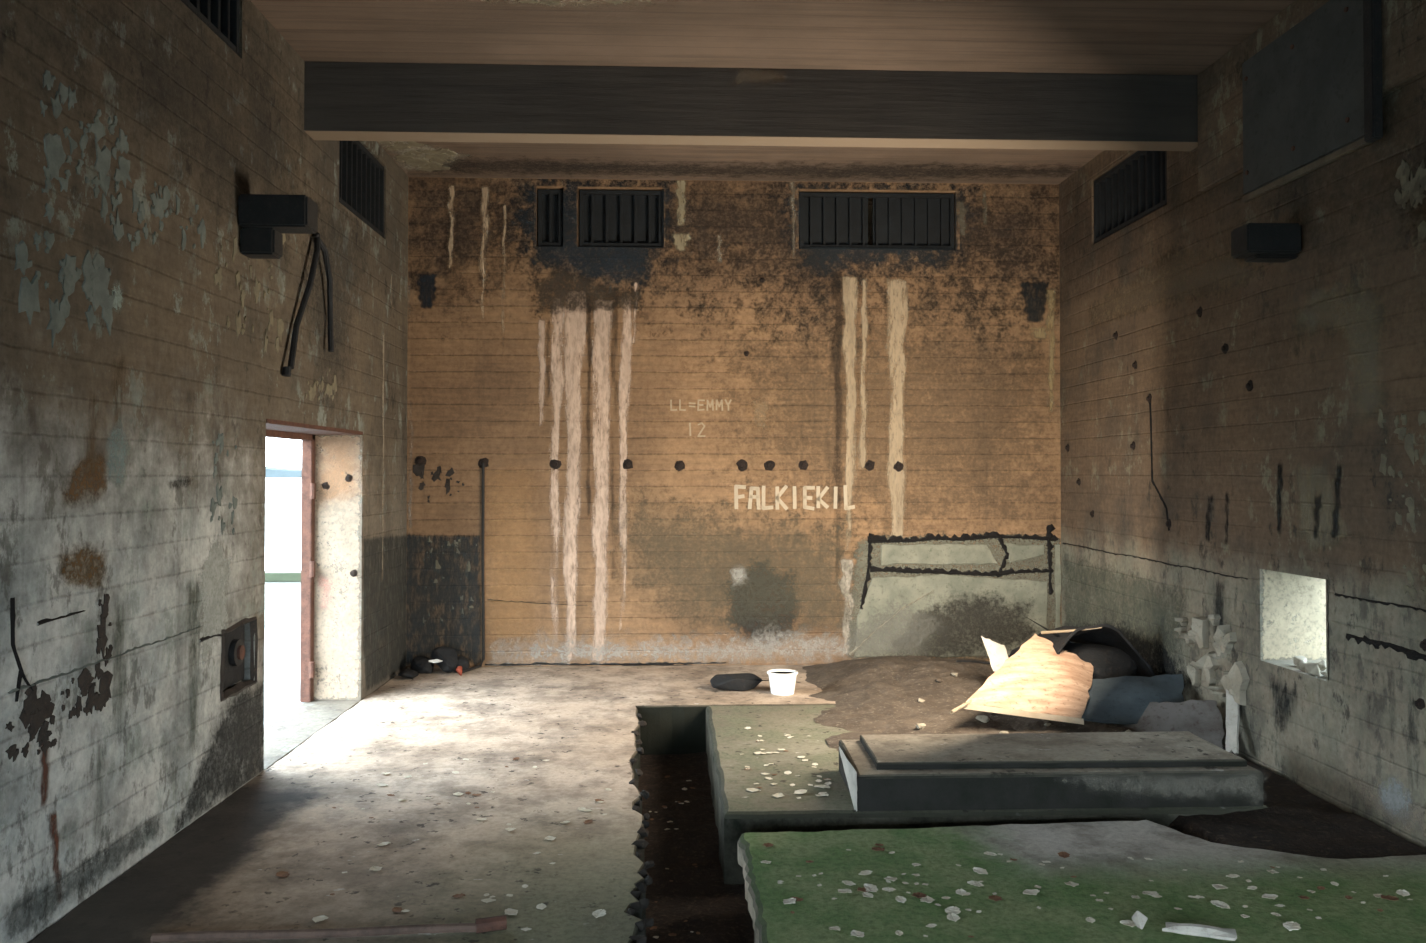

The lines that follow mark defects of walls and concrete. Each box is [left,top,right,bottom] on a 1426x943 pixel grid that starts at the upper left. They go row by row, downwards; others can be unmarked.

peeling [14,69,284,355]
water stain [363,141,1184,690]
spalling [5,594,113,762]
water stain [8,685,264,936]